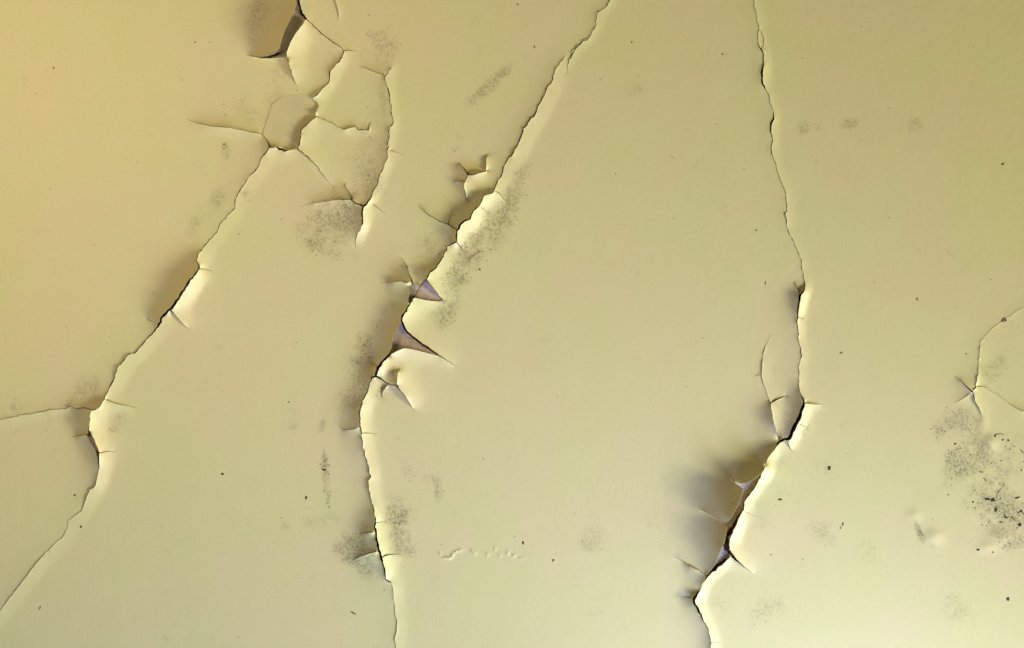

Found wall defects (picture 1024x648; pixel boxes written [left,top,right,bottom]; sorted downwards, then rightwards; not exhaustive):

crack [0,0,404,626]
peeling [349,238,463,417]
crack [950,306,1024,419]
peeling [634,411,793,574]